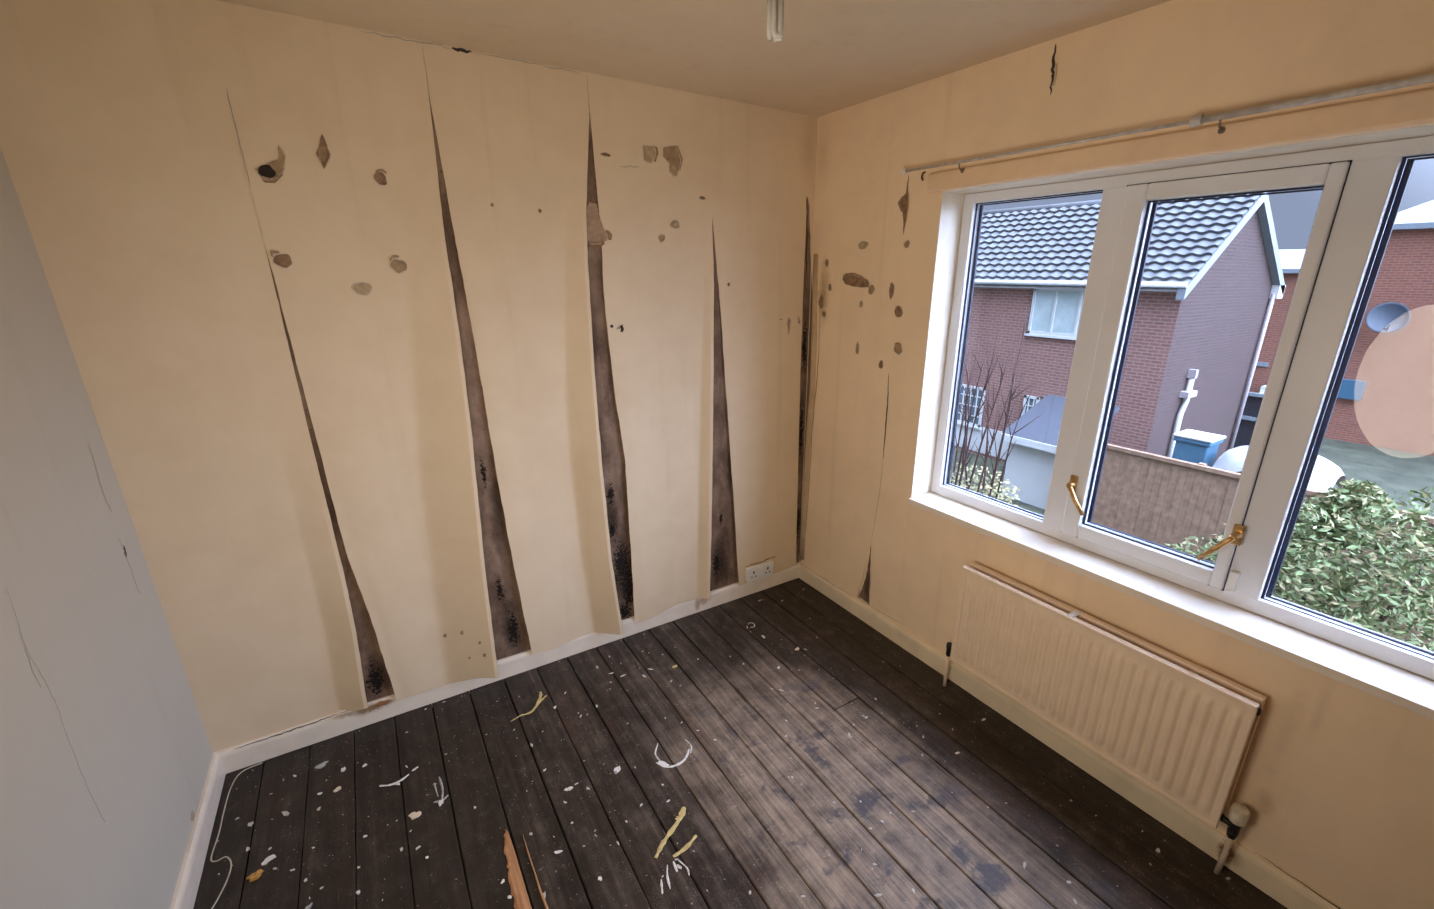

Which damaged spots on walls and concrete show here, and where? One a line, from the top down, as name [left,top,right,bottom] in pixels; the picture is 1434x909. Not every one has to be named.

crack [1049,44,1057,95]
peeling [226,88,286,183]
peeling [315,133,332,169]
peeling [372,169,388,186]
flaking render [586,82,599,213]
peeling [642,145,683,177]
peeling [842,273,903,318]
flaking render [422,47,531,660]
peeling [878,342,903,369]
flaking render [260,226,395,703]
flaking render [587,230,634,620]
flaking render [710,219,739,591]